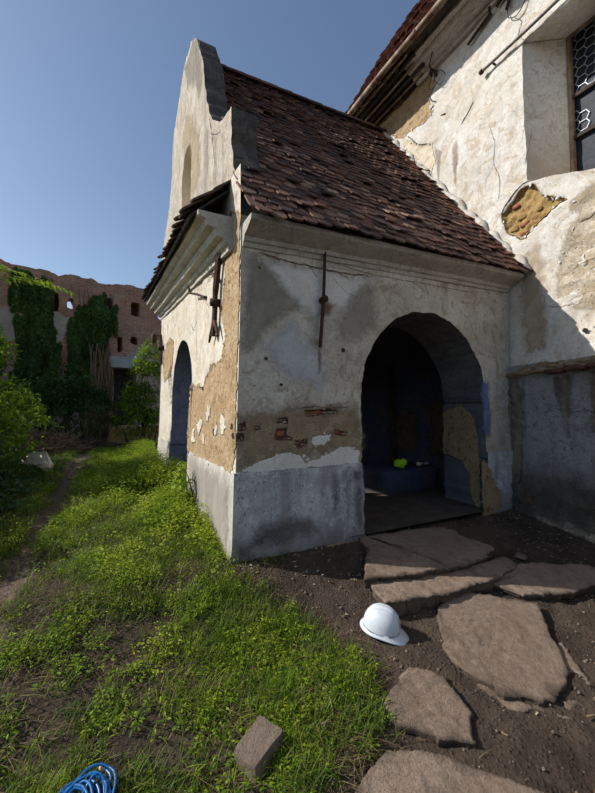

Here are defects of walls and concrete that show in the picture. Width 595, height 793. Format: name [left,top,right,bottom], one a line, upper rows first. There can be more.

flaking render [501,182,595,309]
peeling [163,336,174,382]
peeling [187,210,362,473]
peeling [442,406,503,516]